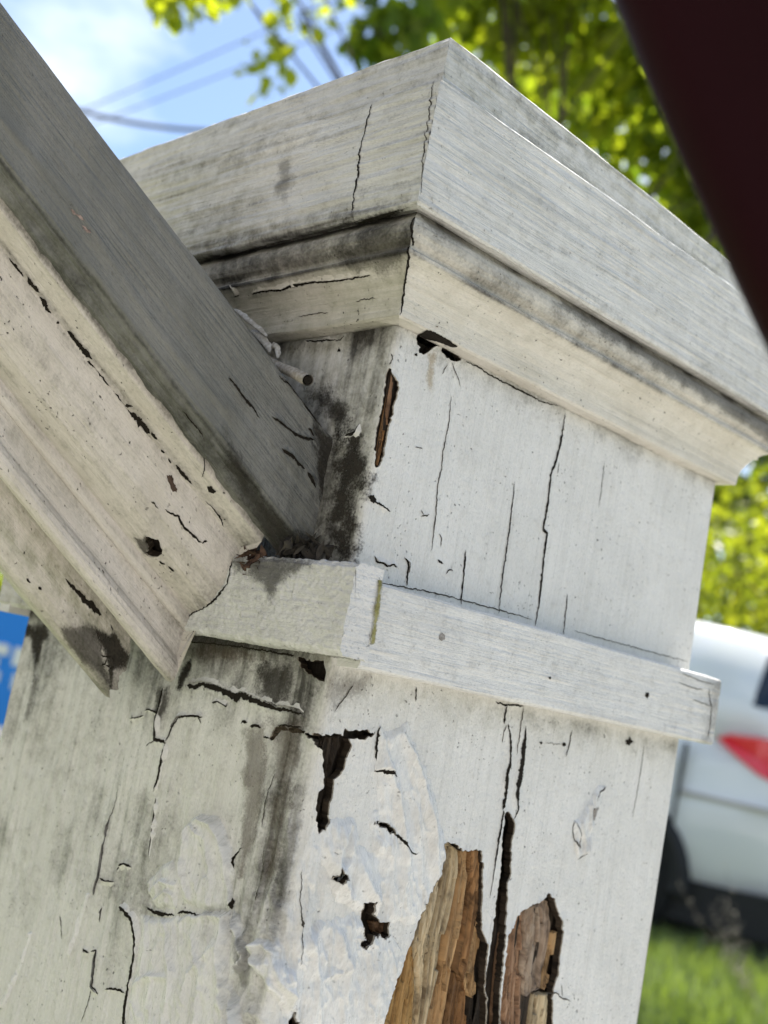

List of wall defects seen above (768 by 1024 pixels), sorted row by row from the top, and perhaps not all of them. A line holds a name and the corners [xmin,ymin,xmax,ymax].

crack [351,105,372,212]
crack [229,270,375,302]
damp [226,443,308,593]
damp [309,390,376,563]
crack [375,361,566,625]
damp [256,661,292,706]
crack [563,595,713,738]
crack [59,677,304,1024]
crack [298,872,306,964]
crack [490,702,527,895]